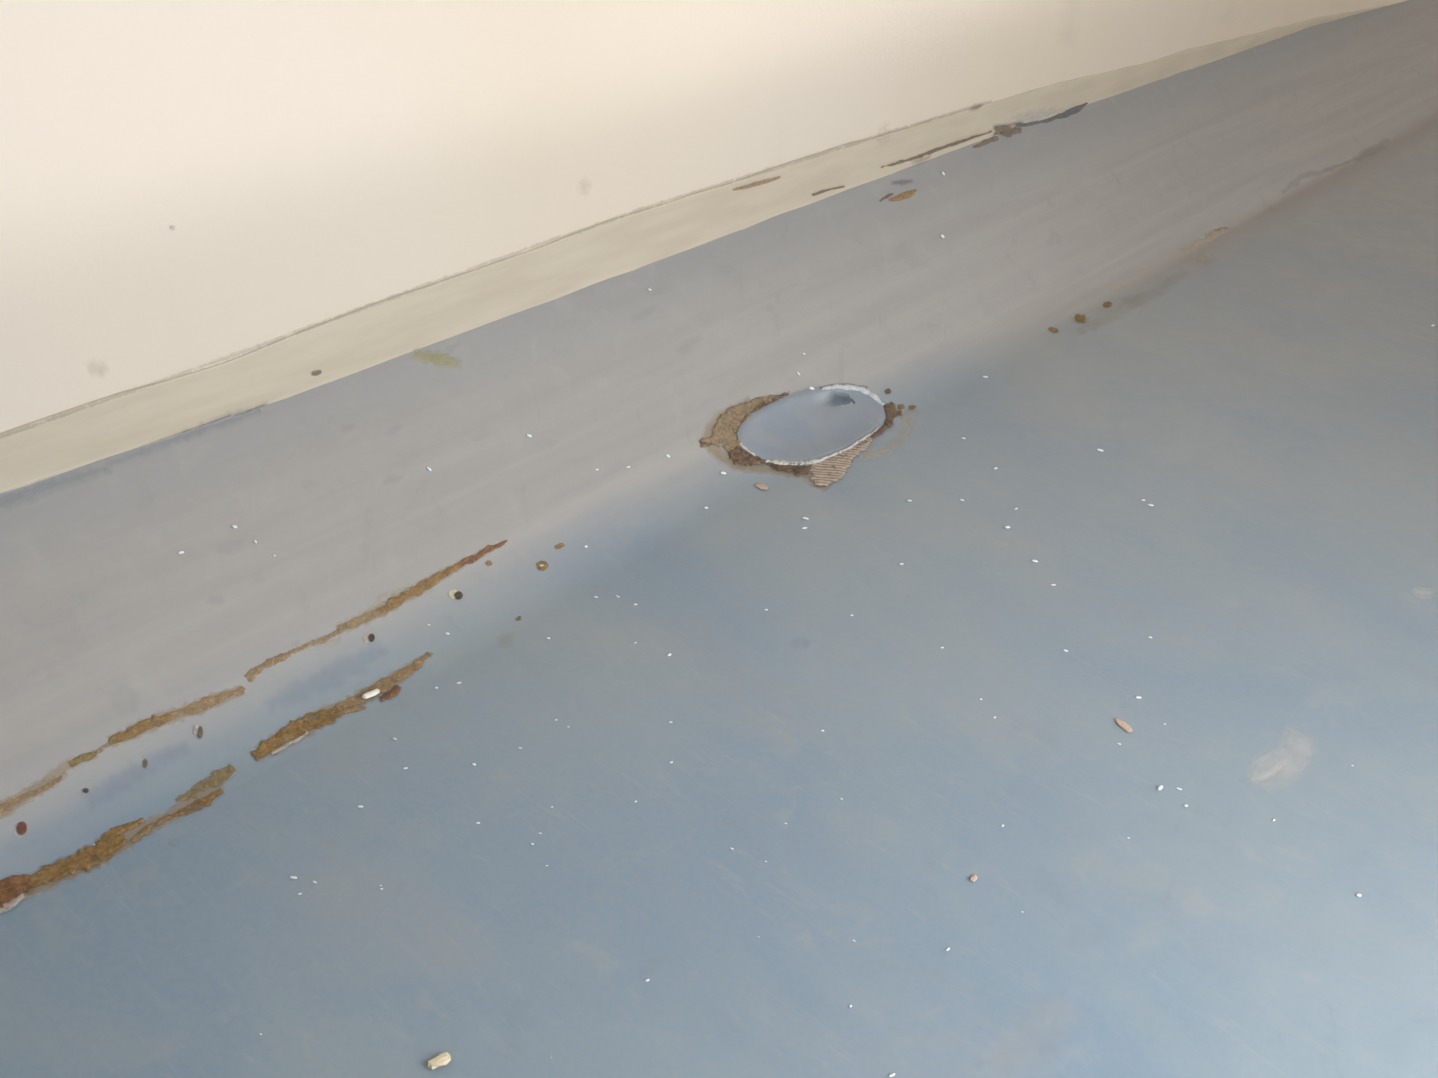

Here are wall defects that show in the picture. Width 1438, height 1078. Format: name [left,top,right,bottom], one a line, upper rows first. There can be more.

peeling [700,384,916,490]
peeling [0,540,507,835]
peeling [0,765,234,908]